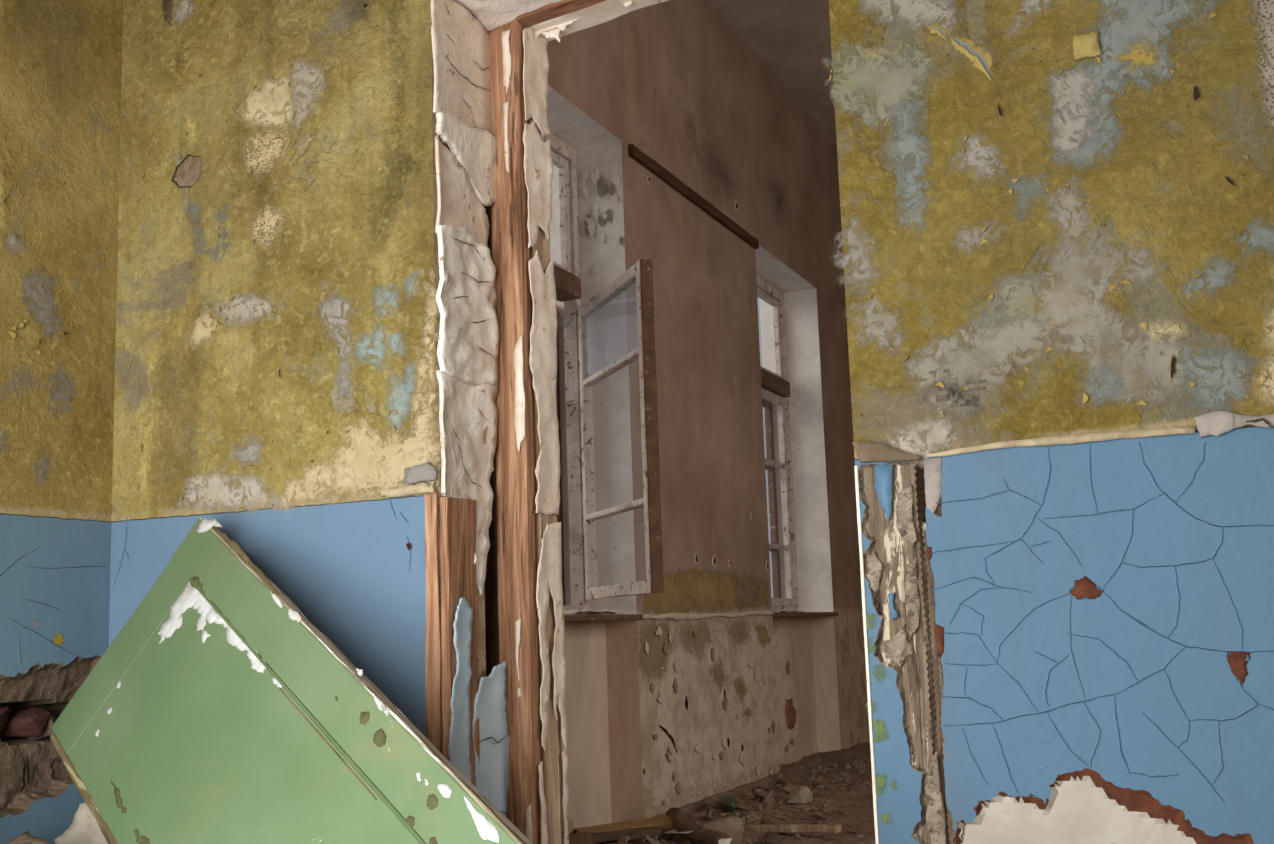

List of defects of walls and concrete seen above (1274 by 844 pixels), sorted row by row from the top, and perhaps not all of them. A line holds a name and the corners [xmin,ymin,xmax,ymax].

peeling [240,61,324,173]
peeling [250,206,283,249]
peeling [581,168,625,245]
peeling [431,0,569,844]
peeling [825,0,1274,844]
crack [8,599,75,669]
flaking render [0,655,101,818]
crack [0,518,130,587]
peeling [178,225,521,819]
peeling [638,569,801,811]
crack [931,442,1274,804]